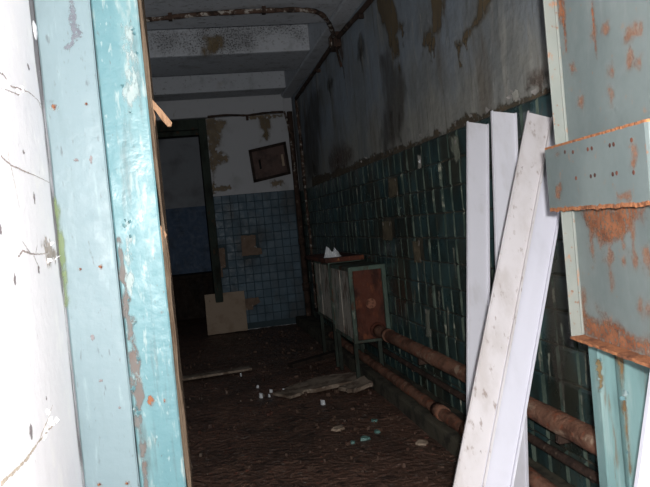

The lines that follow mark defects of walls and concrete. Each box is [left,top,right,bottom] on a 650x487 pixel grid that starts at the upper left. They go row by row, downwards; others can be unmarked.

rust [558,0,567,51]
peeling [206,118,231,194]
crack [18,244,48,268]
rust [583,207,644,264]
peeling [117,235,148,487]
crack [1,408,59,486]